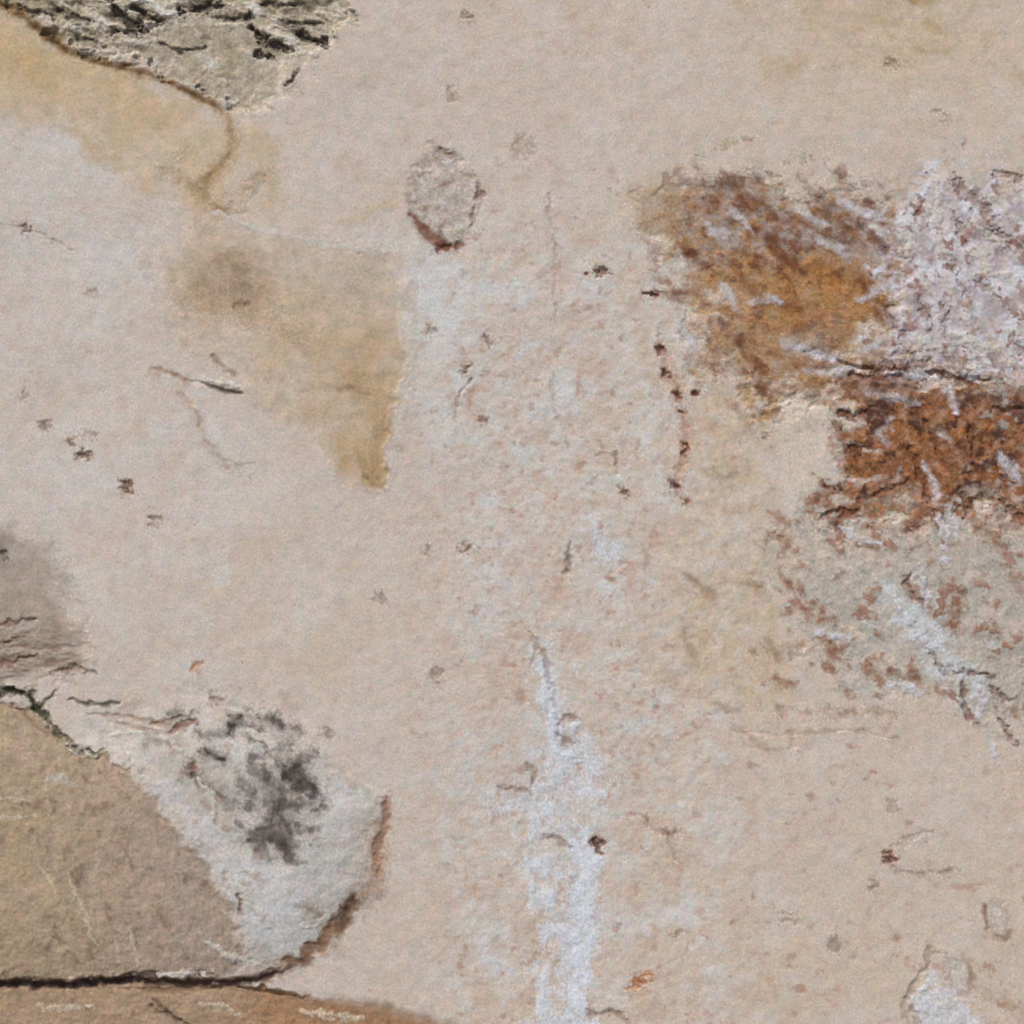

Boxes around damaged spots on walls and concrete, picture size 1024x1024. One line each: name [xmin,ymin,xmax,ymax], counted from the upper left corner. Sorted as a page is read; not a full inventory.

damp [0,13,224,225]
spalling [13,0,362,124]
damp [212,103,289,222]
peeling [130,136,489,498]
rust [607,135,1024,551]
damp [848,137,1024,385]
spalling [0,512,472,1024]
damp [161,695,335,869]
crack [0,967,278,1023]